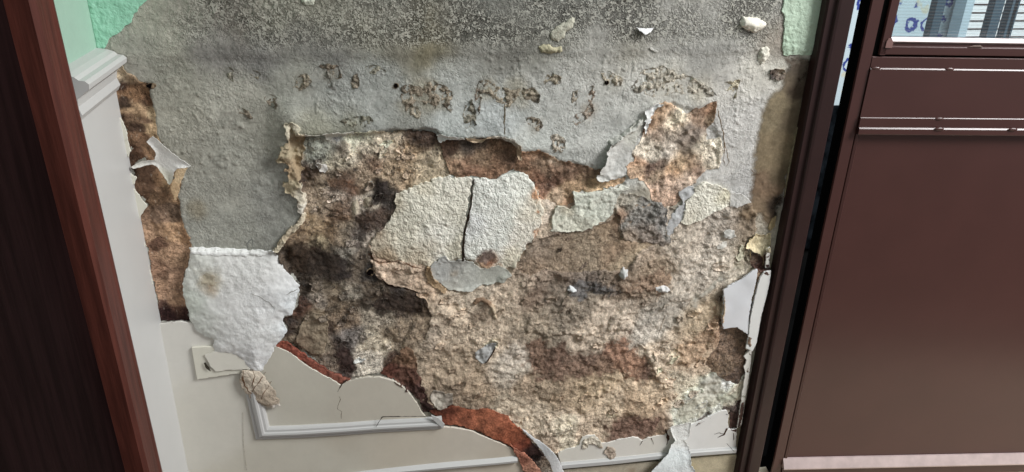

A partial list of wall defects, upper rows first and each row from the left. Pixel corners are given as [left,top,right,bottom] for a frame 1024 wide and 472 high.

spalling [116,64,771,460]
crack [462,180,474,262]
leakage [740,57,810,224]